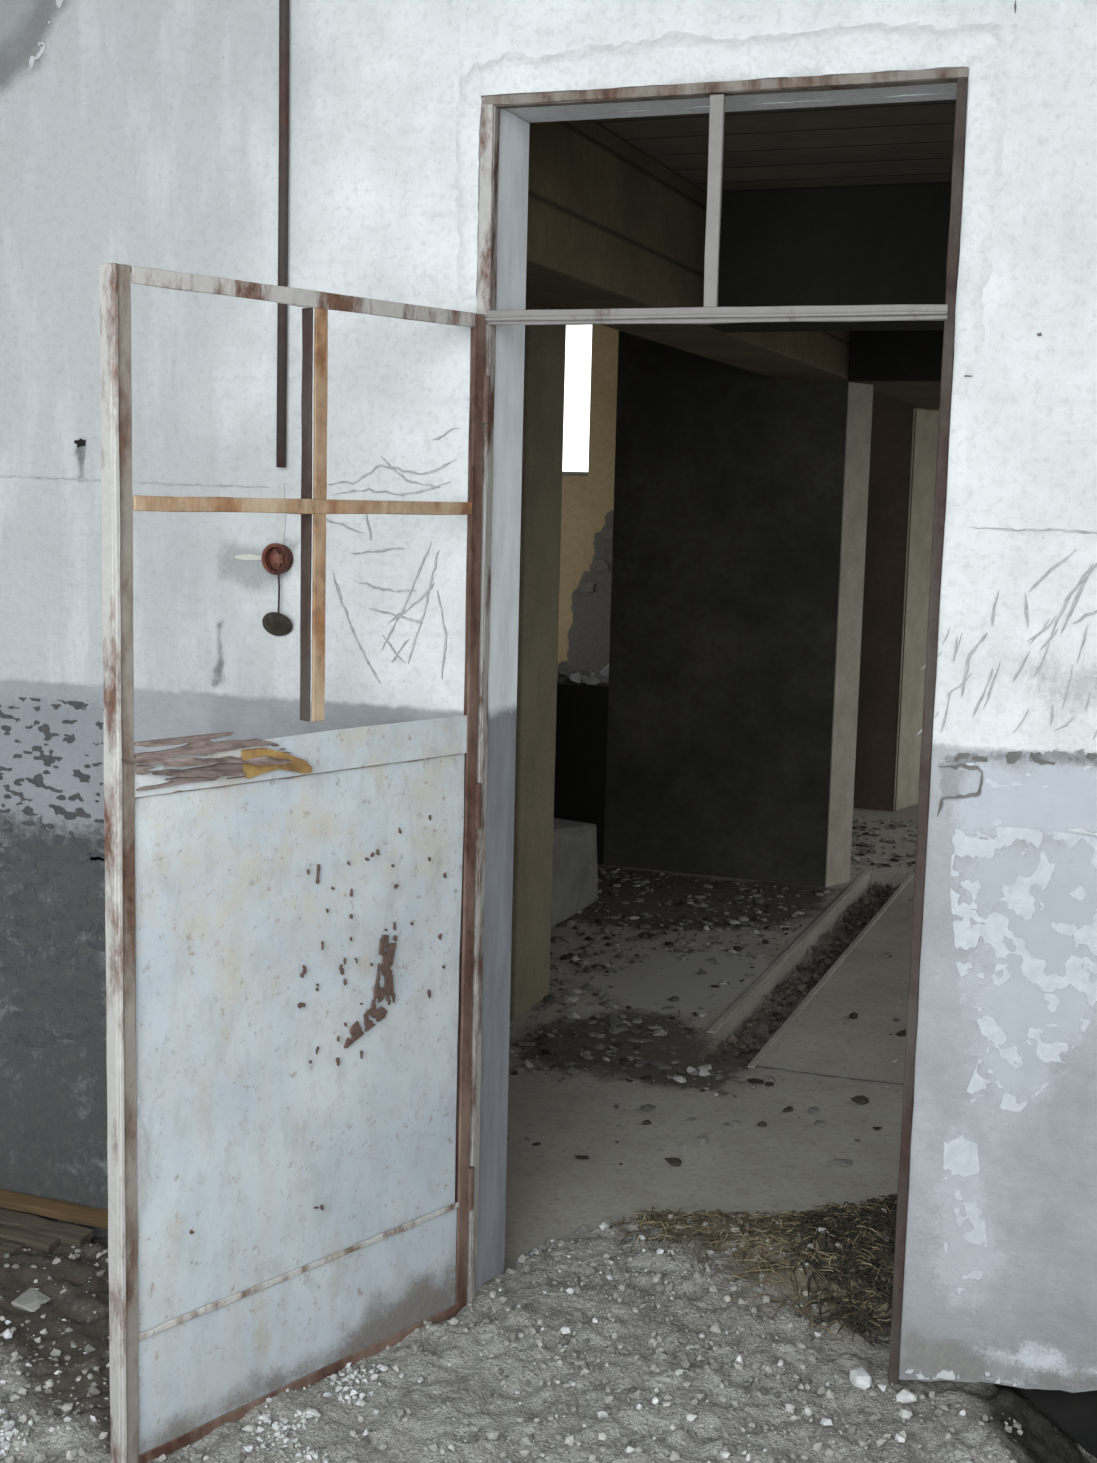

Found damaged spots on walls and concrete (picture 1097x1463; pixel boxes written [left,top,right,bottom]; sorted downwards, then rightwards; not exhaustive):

flaking render [0,0,64,87]
flaking render [567,510,614,683]
peeling [0,697,105,864]
peeling [940,750,1097,1112]
peeling [943,1134,987,1254]
flaking render [905,1335,1097,1390]